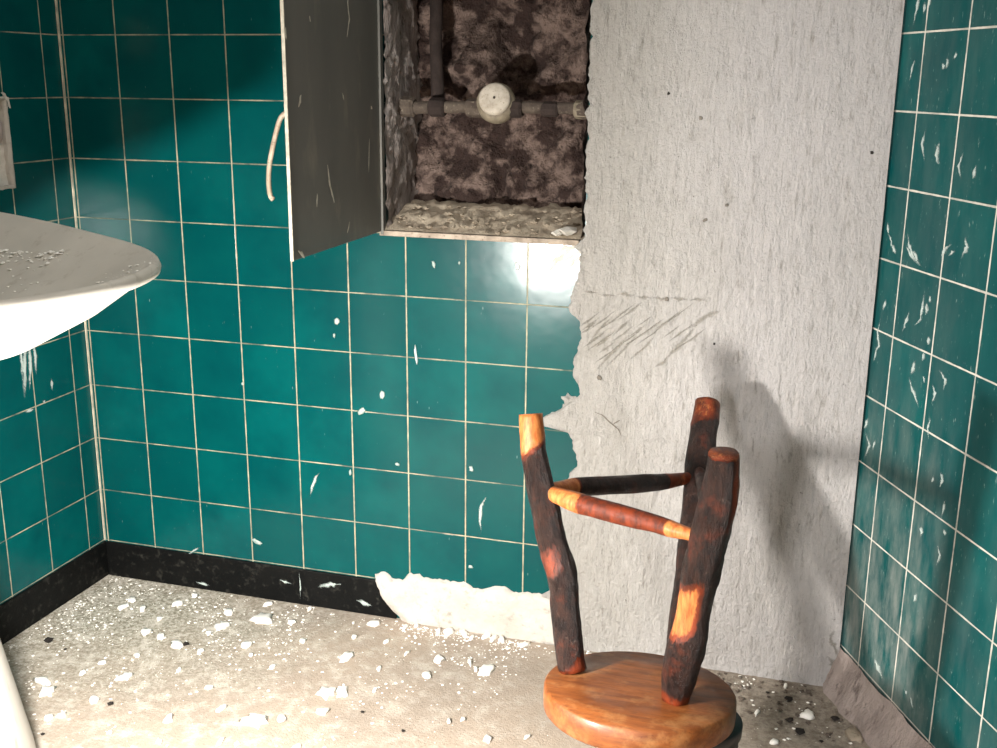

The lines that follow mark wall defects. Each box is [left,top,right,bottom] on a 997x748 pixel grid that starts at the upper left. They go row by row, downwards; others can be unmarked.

spalling [585,296,713,365]